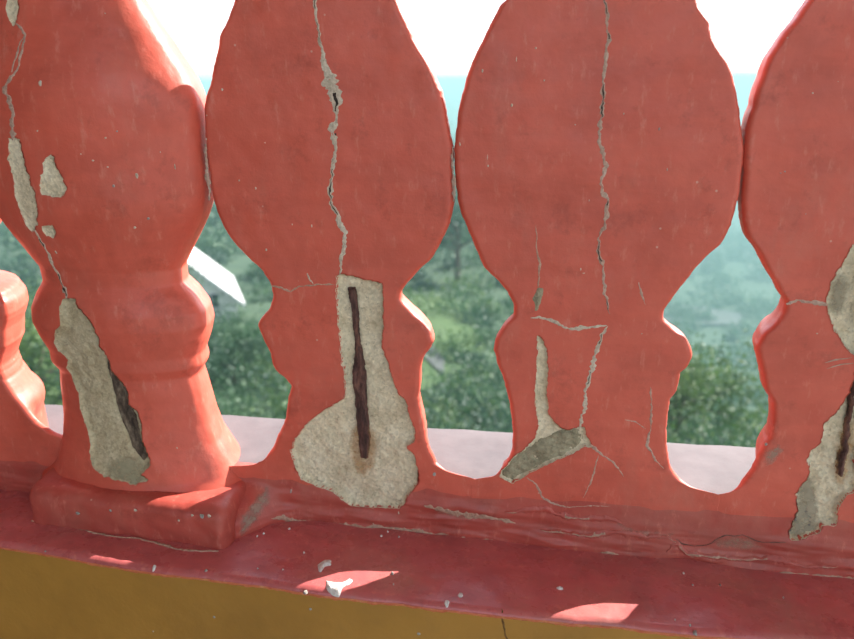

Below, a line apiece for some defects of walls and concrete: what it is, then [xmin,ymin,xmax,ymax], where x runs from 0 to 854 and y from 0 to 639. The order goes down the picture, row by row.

crack [2,23,26,140]
peeling [7,138,67,238]
crack [34,229,68,298]
crack [272,0,348,292]
crack [527,0,624,508]
spalling [826,244,854,355]
spalling [54,298,150,486]
spalling [290,274,418,514]
spalling [501,336,593,484]
crack [645,388,664,469]
spalling [789,381,854,541]
crack [79,529,219,552]